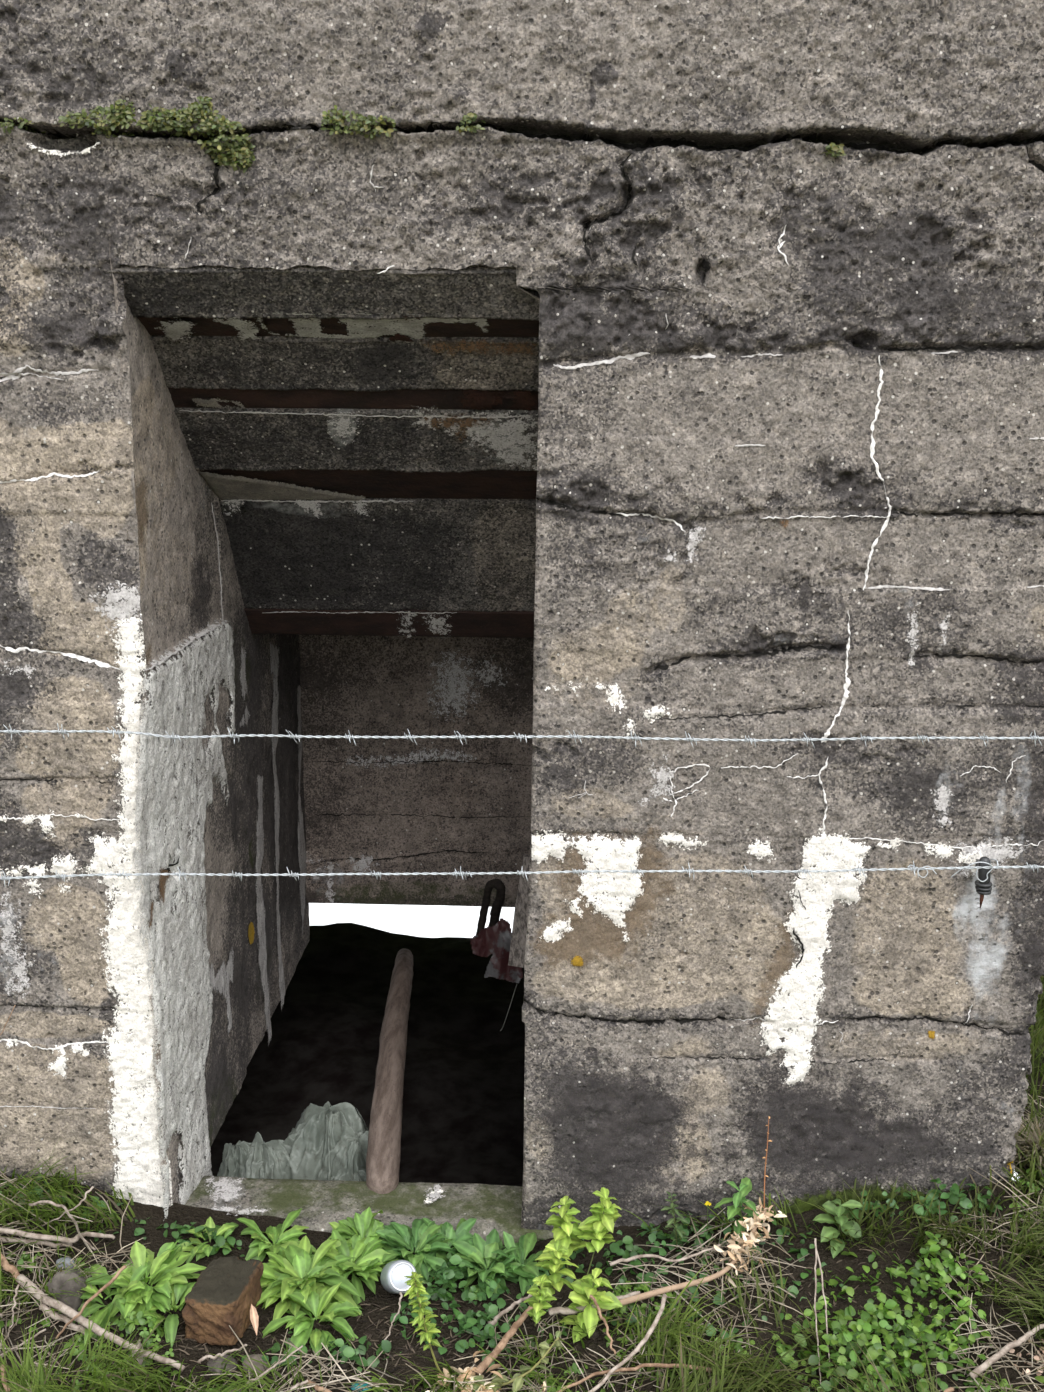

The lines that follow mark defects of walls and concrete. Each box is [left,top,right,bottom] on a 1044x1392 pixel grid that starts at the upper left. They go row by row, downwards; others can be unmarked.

crack [101,122,1044,265]
crack [701,259,710,284]
corrosion [388,315,420,342]
crack [553,315,668,369]
crack [0,365,99,382]
crack [0,471,101,483]
crack [536,498,686,532]
crack [0,503,228,671]
crack [651,342,1044,849]
crack [313,759,530,767]
crack [0,779,123,821]
damp [525,826,957,1220]